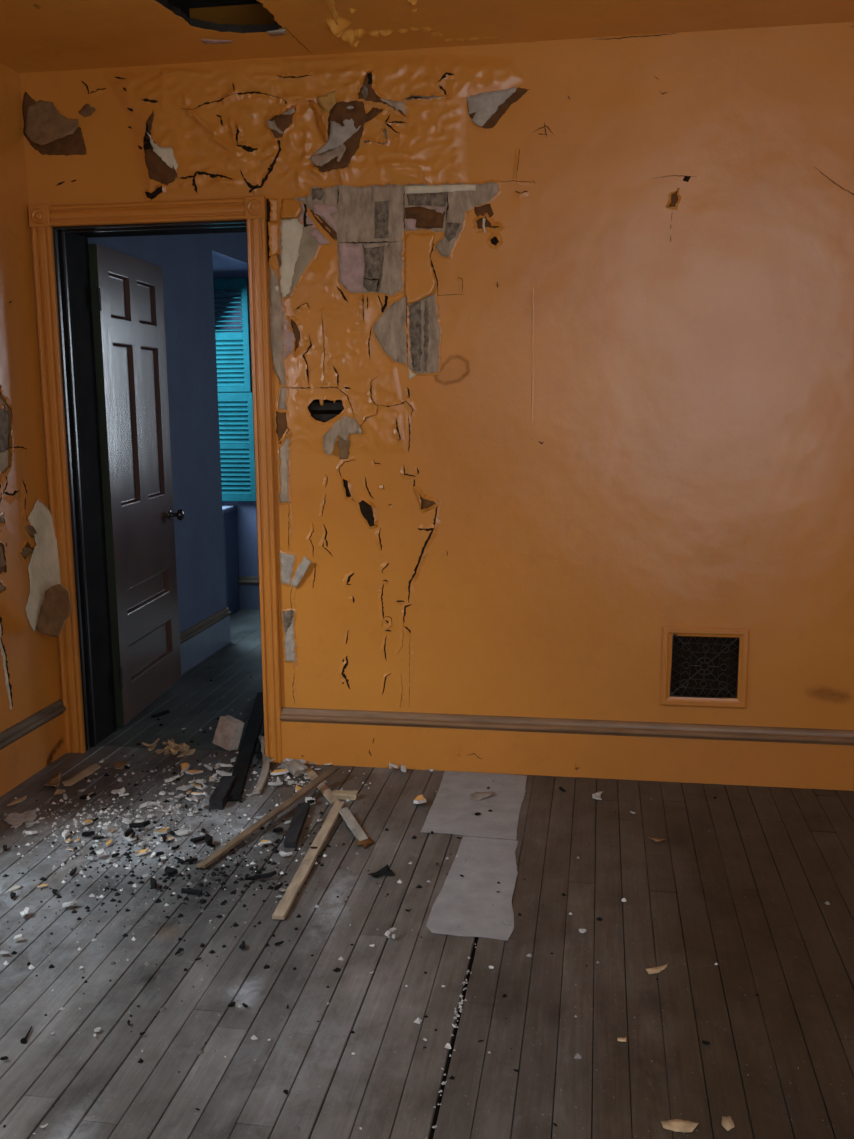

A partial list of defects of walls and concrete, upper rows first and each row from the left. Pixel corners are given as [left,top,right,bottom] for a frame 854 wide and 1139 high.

spalling [190,0,261,8]
peeling [356,70,449,123]
peeling [231,104,300,156]
peeling [142,184,167,202]
crack [427,240,463,296]
peeling [266,179,505,505]
peeling [0,385,15,482]
crack [278,287,442,695]
peeling [0,522,37,595]